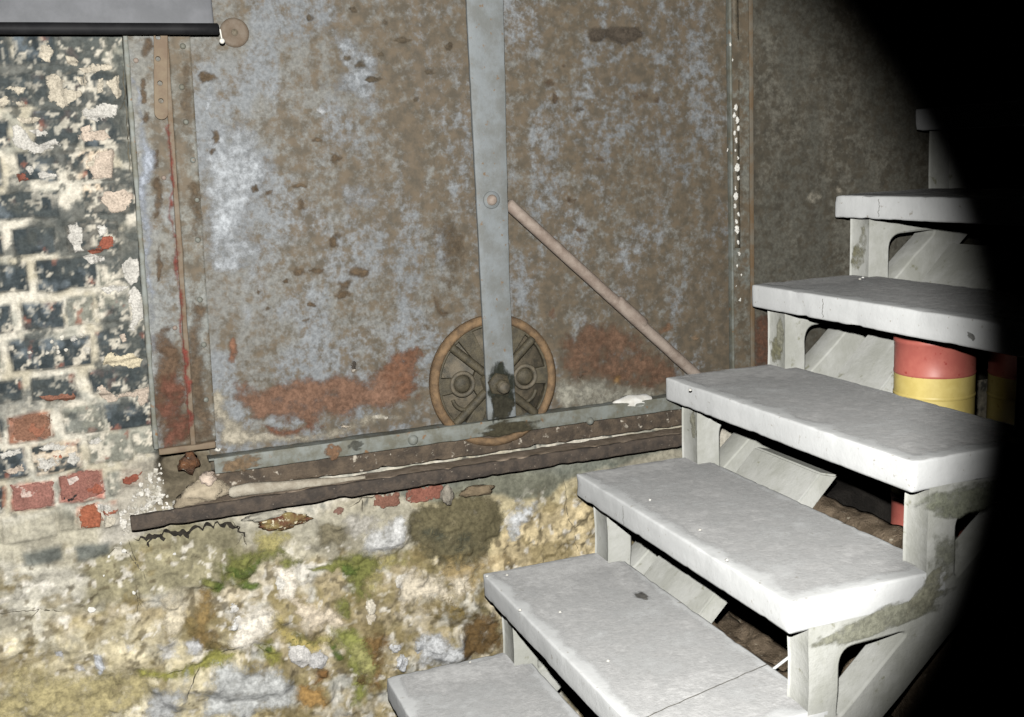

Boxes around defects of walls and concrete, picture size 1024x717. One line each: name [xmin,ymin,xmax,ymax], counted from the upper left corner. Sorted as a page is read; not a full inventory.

peeling [0,86,61,182]
peeling [39,41,121,179]
rust [153,150,174,217]
peeling [100,139,154,369]
rust [152,293,213,447]
rust [236,348,418,436]
rust [563,325,676,390]
spalling [0,393,118,528]
crack [108,521,247,611]
water stain [409,496,532,569]
water stain [186,590,228,650]
water stain [357,635,388,688]